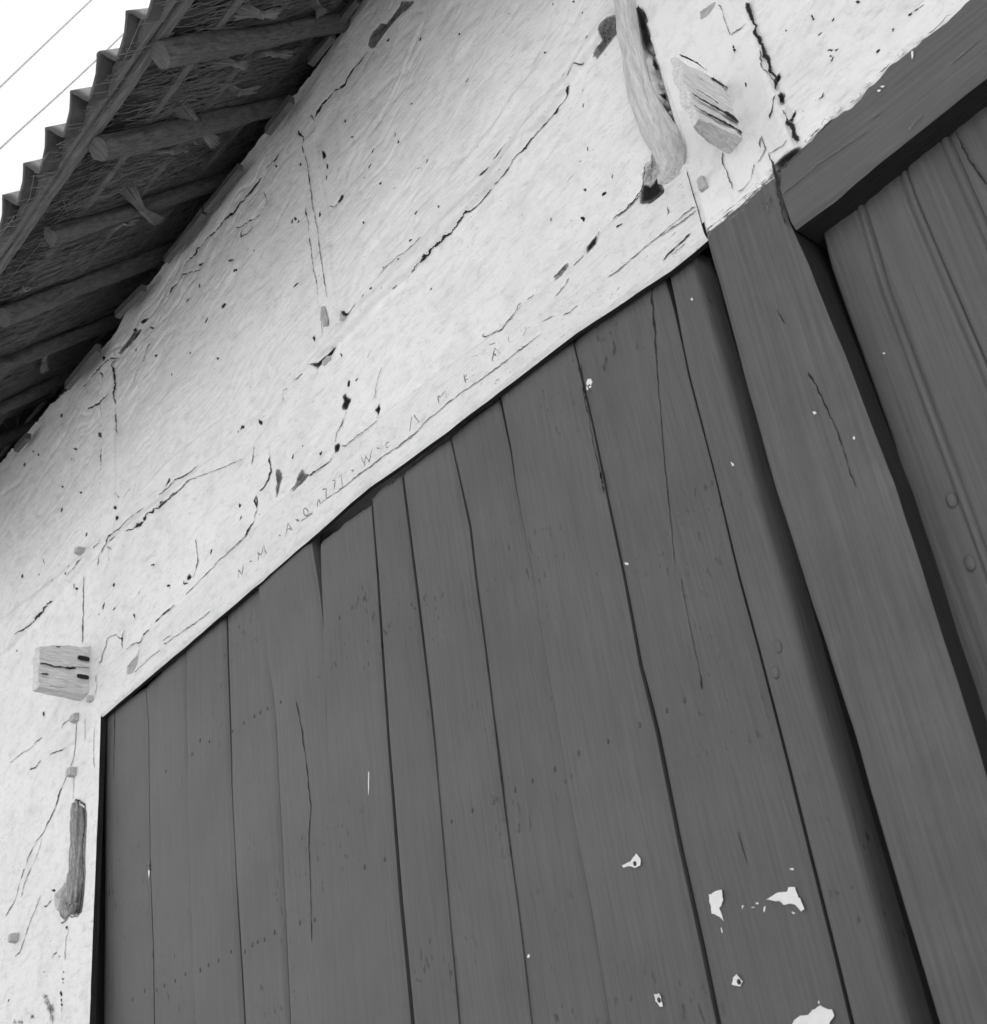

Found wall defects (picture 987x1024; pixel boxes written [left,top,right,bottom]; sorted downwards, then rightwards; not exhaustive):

crack [170,51,375,328]
crack [378,62,584,289]
spalling [586,15,617,57]
crack [679,2,824,225]
crack [55,341,152,473]
crack [40,450,272,698]
spalling [276,469,309,497]
crack [6,720,95,1021]